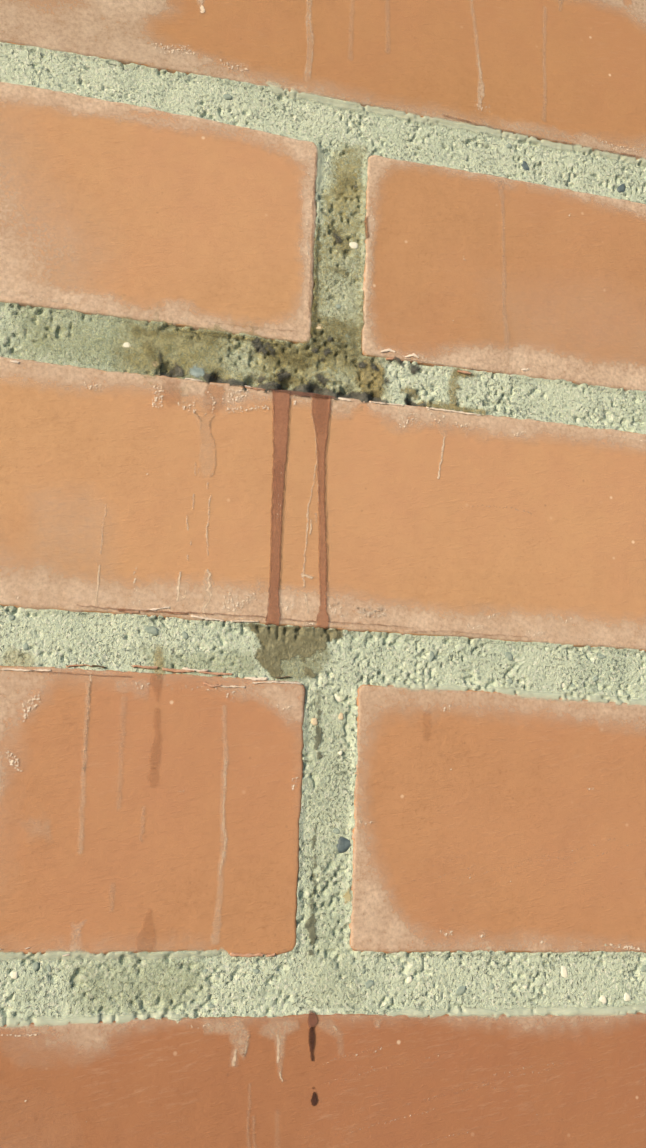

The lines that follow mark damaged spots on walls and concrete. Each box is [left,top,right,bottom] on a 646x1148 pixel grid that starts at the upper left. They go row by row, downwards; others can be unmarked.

leakage [0,82,646,721]
leakage [0,667,43,731]
leakage [314,710,323,759]
leakage [357,686,646,767]
leakage [305,828,317,955]
leakage [350,808,453,952]
leakage [308,1011,318,1061]